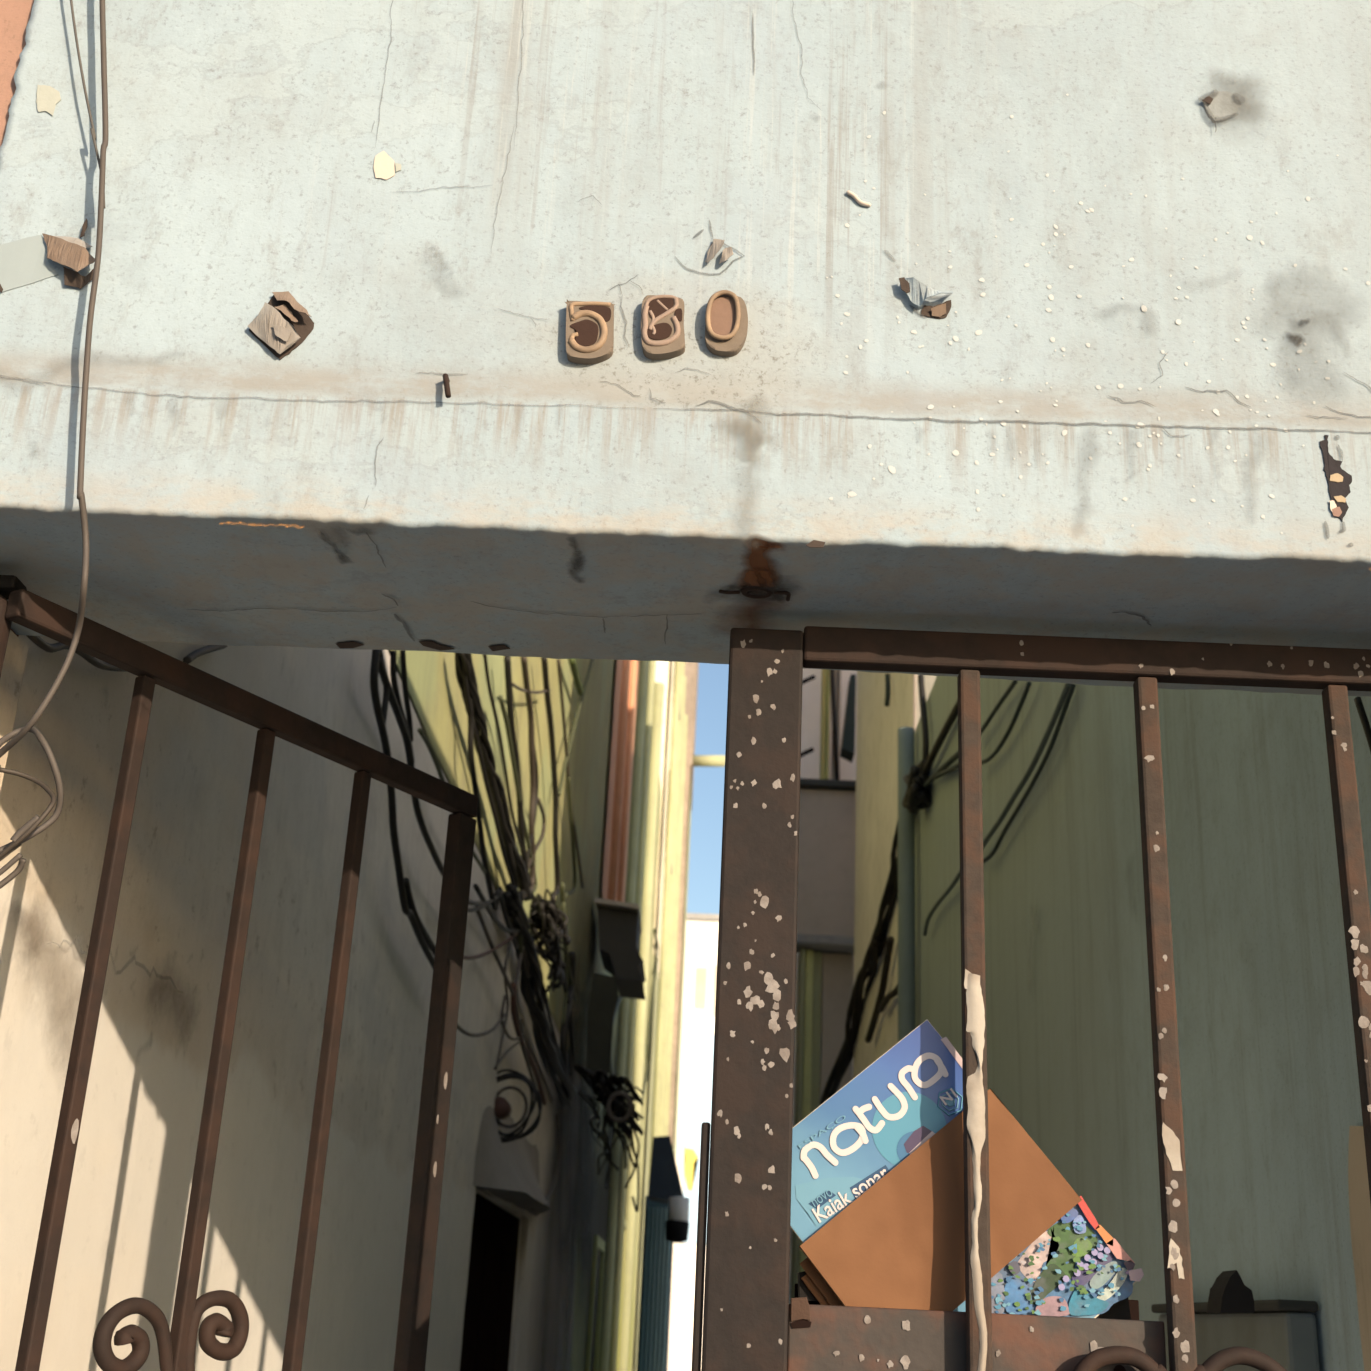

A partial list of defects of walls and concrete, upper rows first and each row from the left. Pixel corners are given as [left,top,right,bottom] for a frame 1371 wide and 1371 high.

spalling [1199,90,1244,132]
peeling [1320,435,1353,546]
crack [189,534,414,641]
corrosion [741,537,782,629]